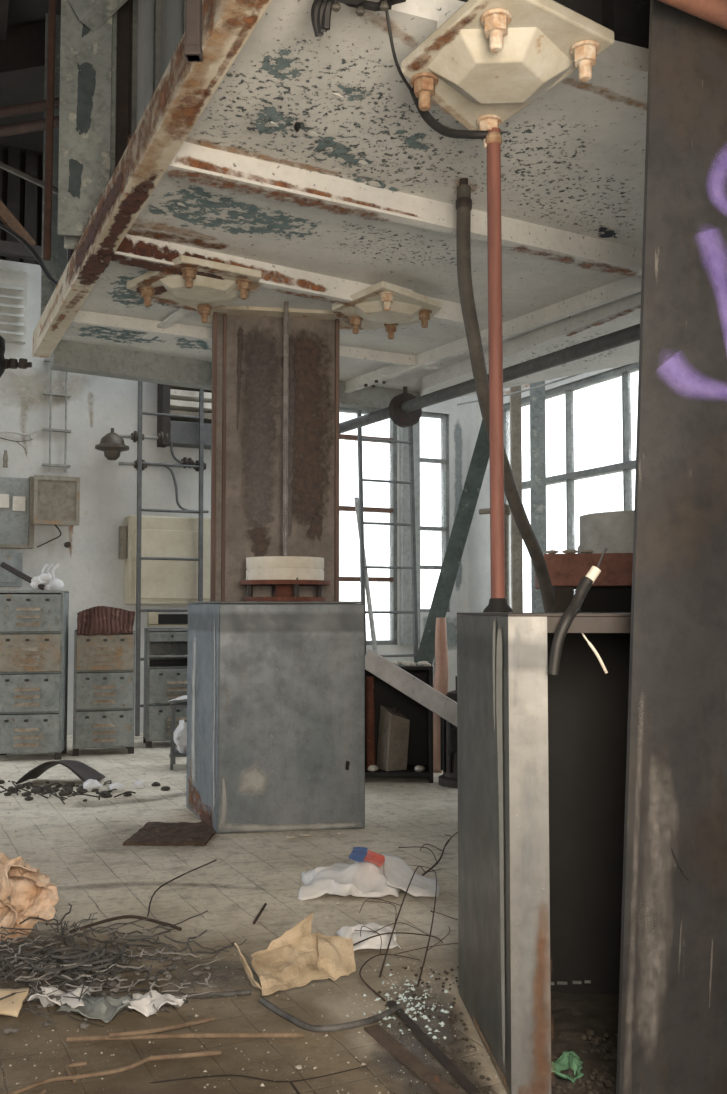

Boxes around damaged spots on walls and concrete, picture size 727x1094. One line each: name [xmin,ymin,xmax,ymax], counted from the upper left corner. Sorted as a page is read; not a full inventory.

rust [407,17,474,71]
peeling [194,37,487,195]
rust [40,0,417,334]
peeling [147,182,321,241]
peeling [338,222,457,266]
peeling [102,270,169,310]